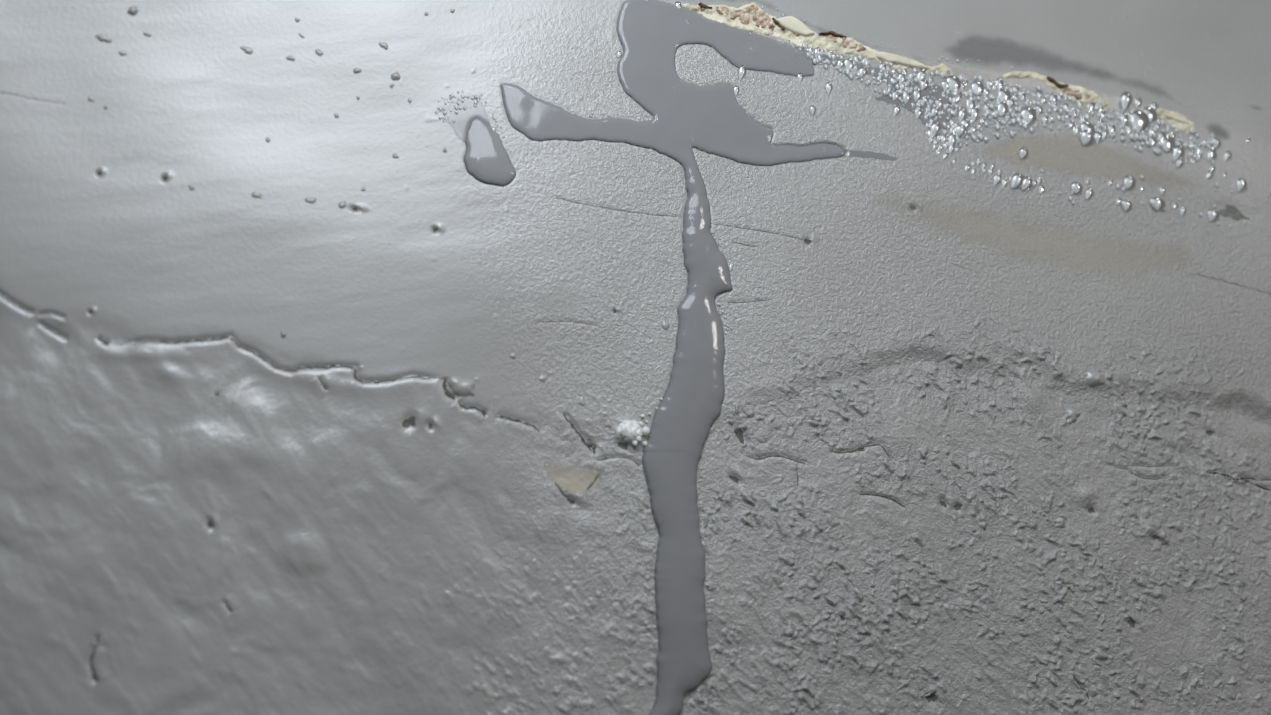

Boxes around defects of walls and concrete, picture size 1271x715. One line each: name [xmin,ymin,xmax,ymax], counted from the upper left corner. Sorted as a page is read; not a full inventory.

peeling [682,2,953,76]
damp [442,99,516,187]
spalling [402,416,433,430]
damp [616,420,644,443]
peeling [545,470,603,504]